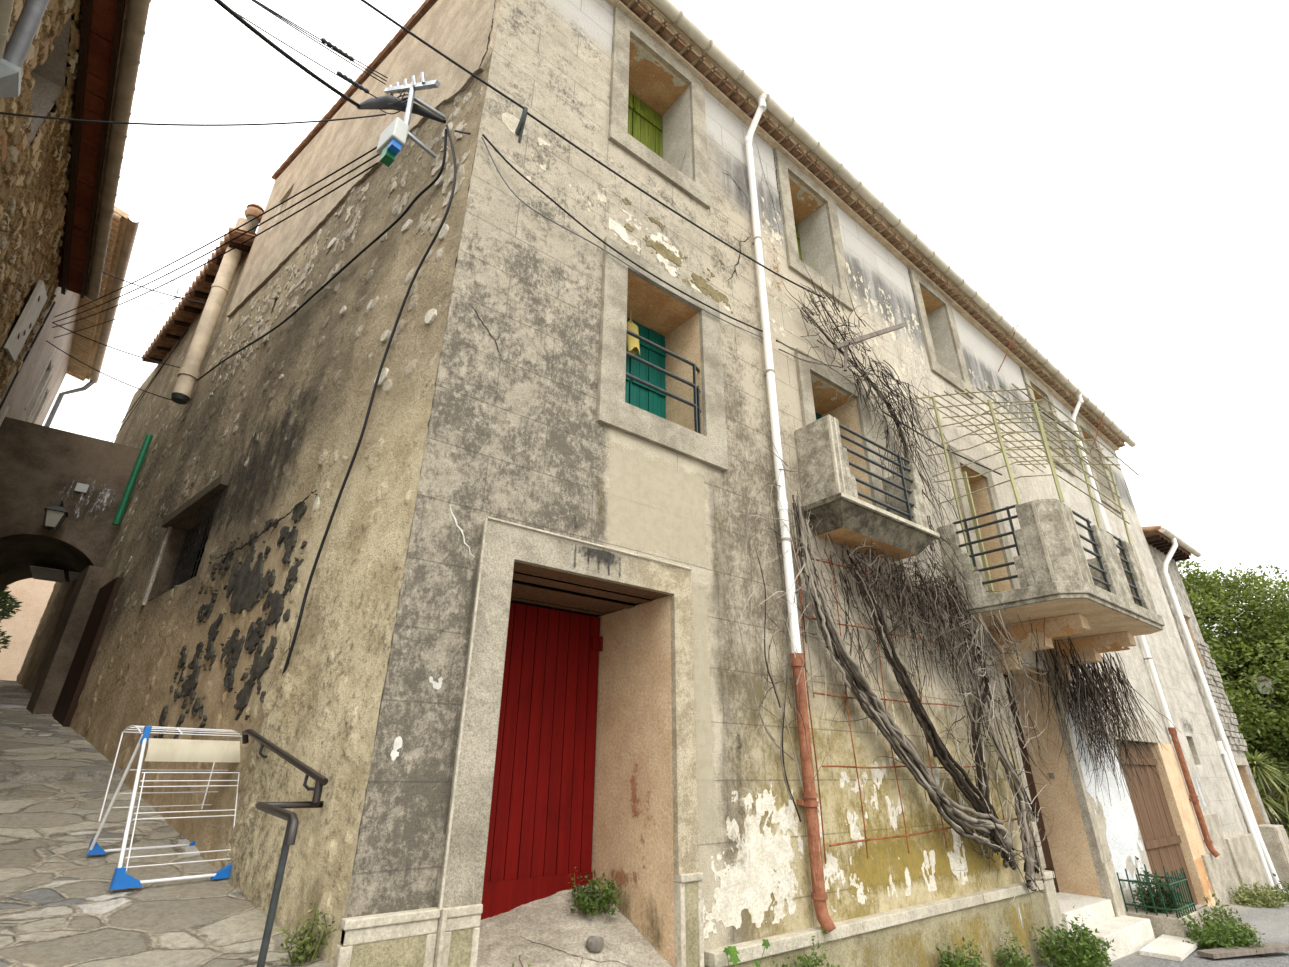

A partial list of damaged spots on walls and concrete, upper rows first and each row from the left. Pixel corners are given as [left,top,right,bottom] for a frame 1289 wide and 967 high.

peeling [207,182,369,400]
peeling [381,103,470,241]
flaking render [424,308,437,325]
peeling [581,188,702,293]
damp [154,494,318,739]
peeling [703,782,804,938]
peeling [814,717,973,912]